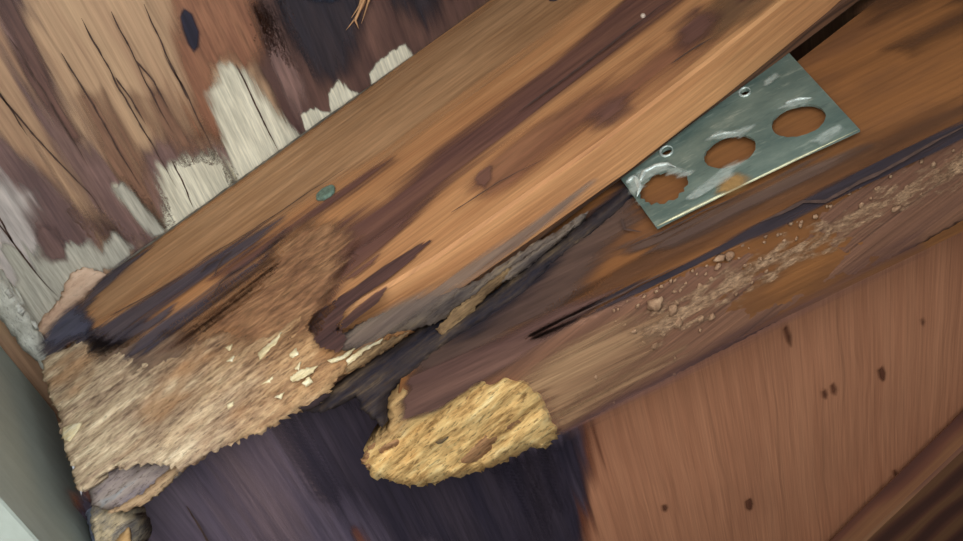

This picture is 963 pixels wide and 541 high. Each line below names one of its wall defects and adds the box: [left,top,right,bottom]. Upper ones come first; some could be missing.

crack [0,36,107,218]
crack [61,53,141,187]
crack [81,5,222,206]
peeling [114,63,358,236]
crack [236,65,277,148]
water stain [0,0,771,372]
peeling [369,45,412,84]
peeling [62,422,82,442]
peeling [258,332,282,360]
spalling [299,393,331,411]
water stain [143,314,731,541]
water stain [72,490,92,520]